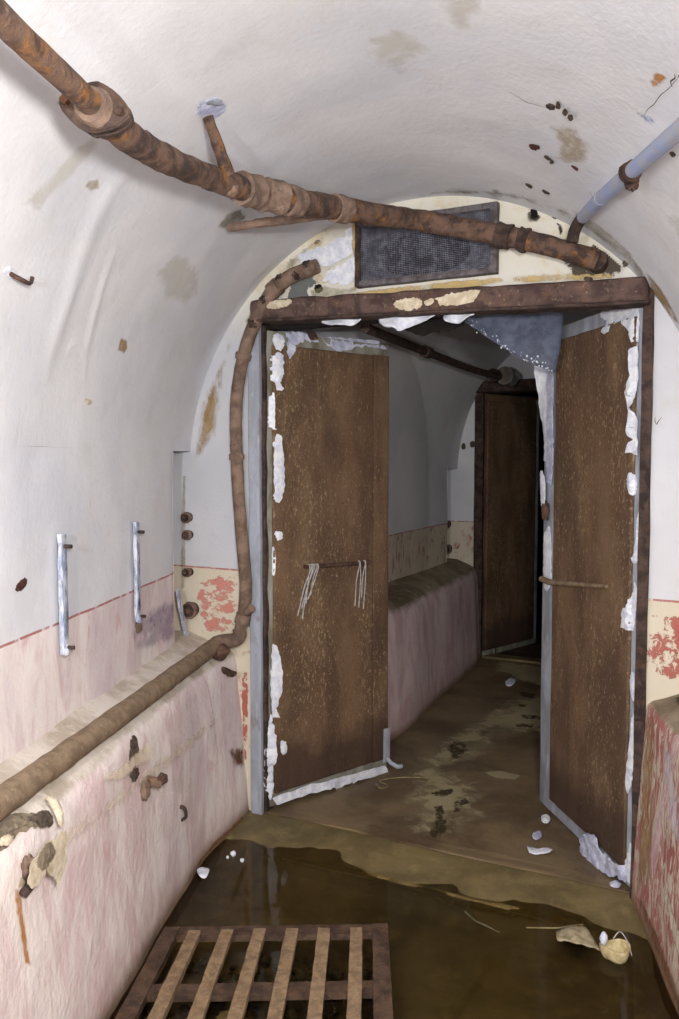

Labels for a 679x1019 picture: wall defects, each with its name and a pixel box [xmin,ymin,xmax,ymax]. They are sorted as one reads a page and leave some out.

crack [644,74,679,115]
flaking render [266,223,501,331]
flaking render [515,245,628,282]
water stain [199,394,215,451]
peeling [197,576,236,632]
peeling [647,615,679,679]
peeling [107,721,214,806]
spalling [0,796,83,889]
corrosion [16,880,29,963]